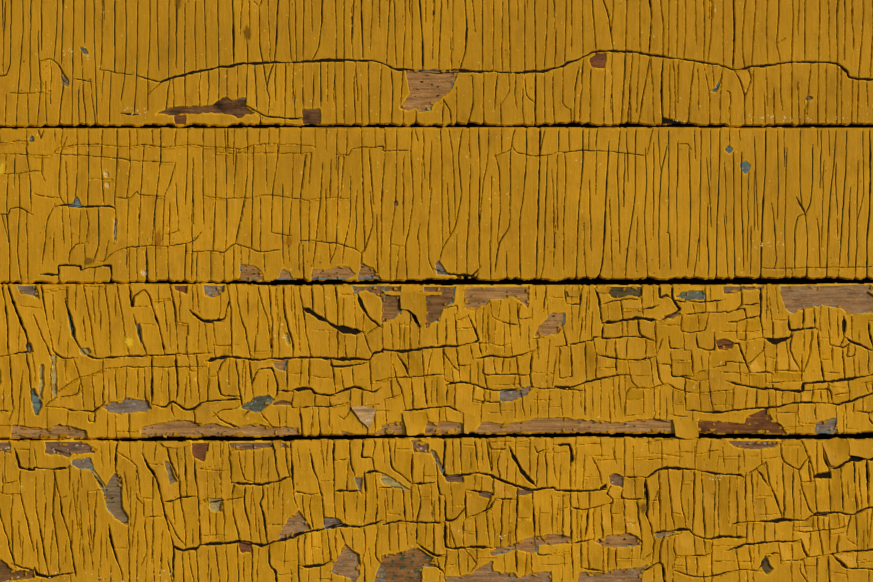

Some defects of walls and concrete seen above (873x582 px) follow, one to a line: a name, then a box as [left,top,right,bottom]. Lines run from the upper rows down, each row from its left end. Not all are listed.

peeling [157,97,254,124]
peeling [400,69,459,112]
crack [0,0,873,438]
peeling [311,264,531,328]
peeling [780,285,873,315]
peeling [31,355,57,415]
peeling [0,424,128,525]
peeling [0,559,35,582]
peeling [374,548,435,582]
peeling [445,534,572,582]
peeling [577,565,647,582]
peeling [595,533,642,548]